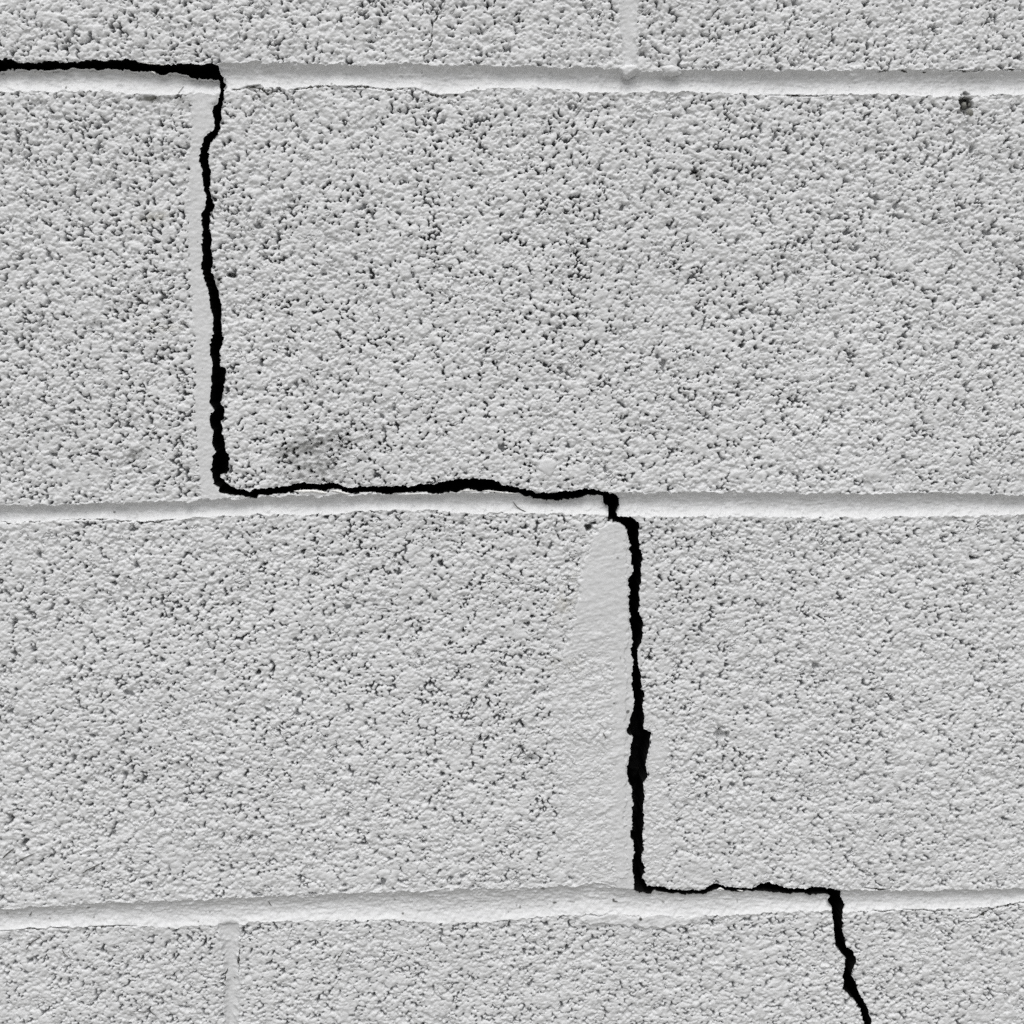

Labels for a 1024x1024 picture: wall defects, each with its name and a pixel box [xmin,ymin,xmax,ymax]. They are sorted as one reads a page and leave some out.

crack [0,58,603,501]
crack [600,491,872,1024]